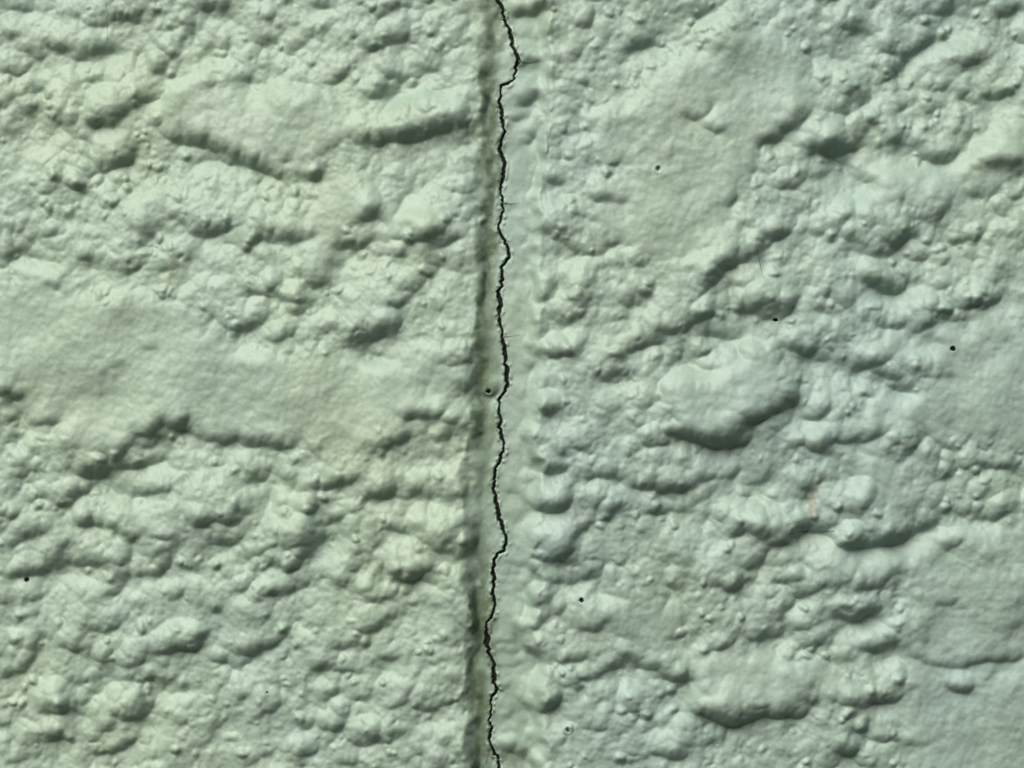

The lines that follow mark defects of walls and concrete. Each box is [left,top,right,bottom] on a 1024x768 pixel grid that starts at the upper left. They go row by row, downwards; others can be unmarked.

crack [484,0,536,768]